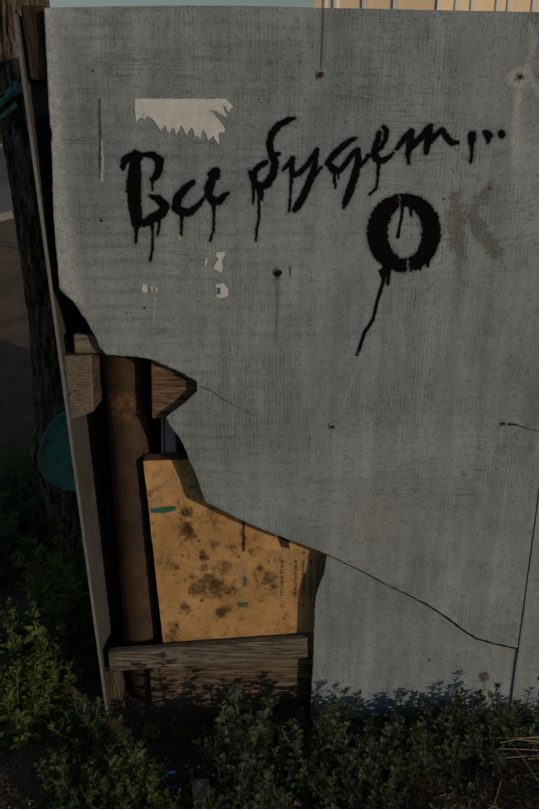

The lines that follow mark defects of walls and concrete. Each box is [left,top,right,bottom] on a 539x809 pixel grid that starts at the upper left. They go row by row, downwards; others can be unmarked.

crack [327,554,518,649]